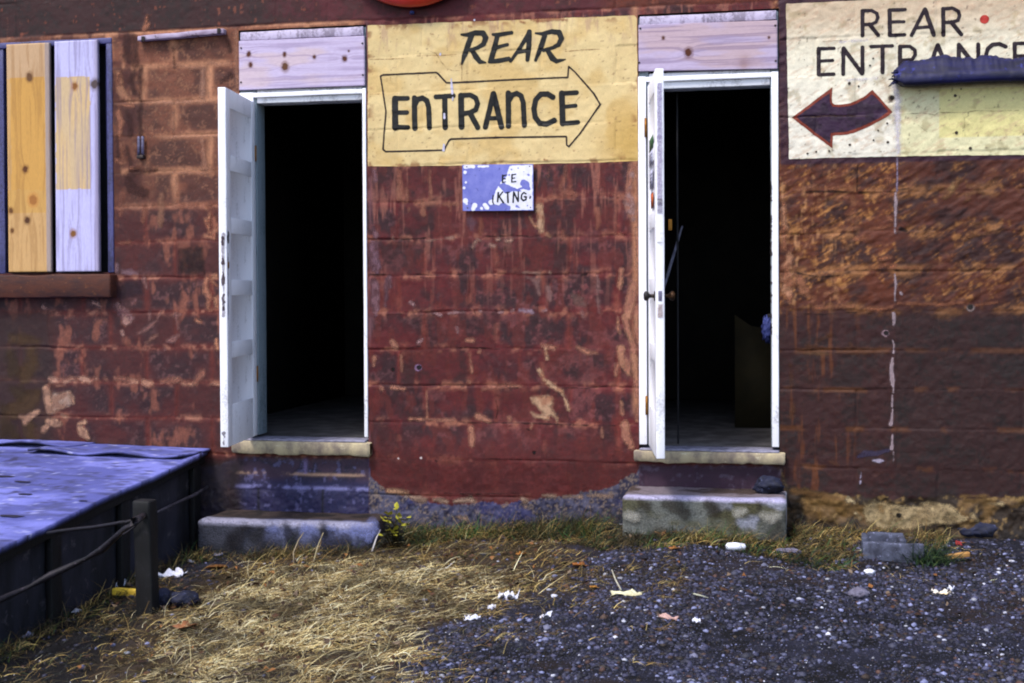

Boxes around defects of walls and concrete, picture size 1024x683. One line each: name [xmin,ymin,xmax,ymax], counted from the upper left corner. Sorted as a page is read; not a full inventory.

peeling [853,158,898,241]
peeling [770,181,990,335]
peeling [77,420,90,439]
peeling [19,370,220,433]
peeling [531,347,569,419]
spalling [380,487,474,504]
spalling [845,496,980,529]